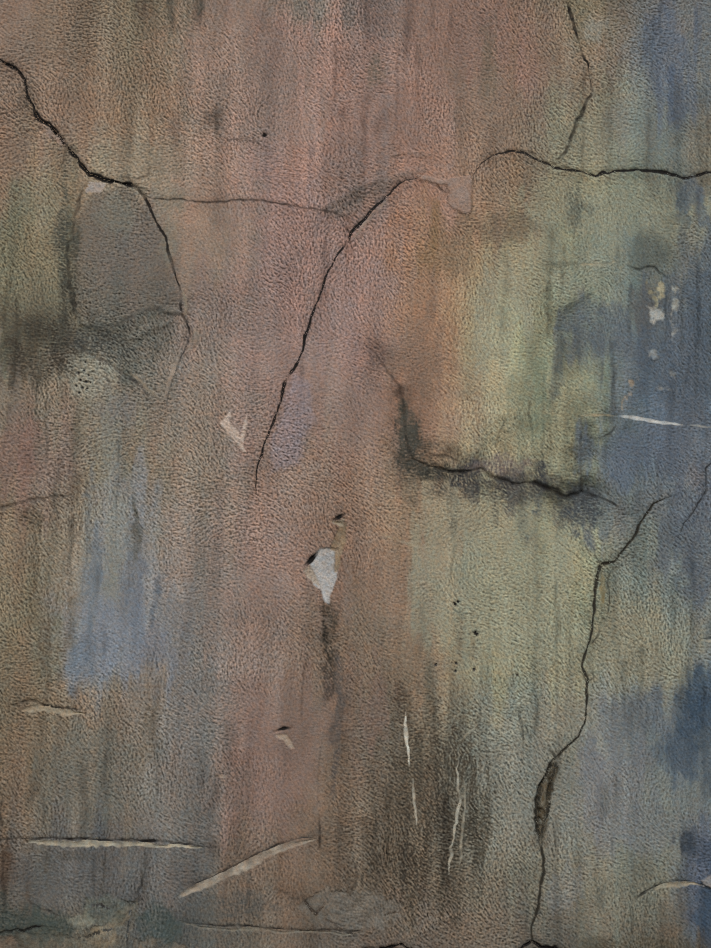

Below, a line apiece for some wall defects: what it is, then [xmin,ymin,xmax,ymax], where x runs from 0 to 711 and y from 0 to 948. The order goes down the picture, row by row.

crack [164,0,206,27]
crack [472,0,711,181]
crack [0,58,421,493]
crack [542,260,596,341]
leakage [0,124,292,944]
spalling [302,513,348,605]
leakage [363,109,711,948]
crack [680,462,711,533]
crack [373,352,667,948]
hole [177,836,317,899]
crack [315,816,323,850]
crack [276,888,411,948]